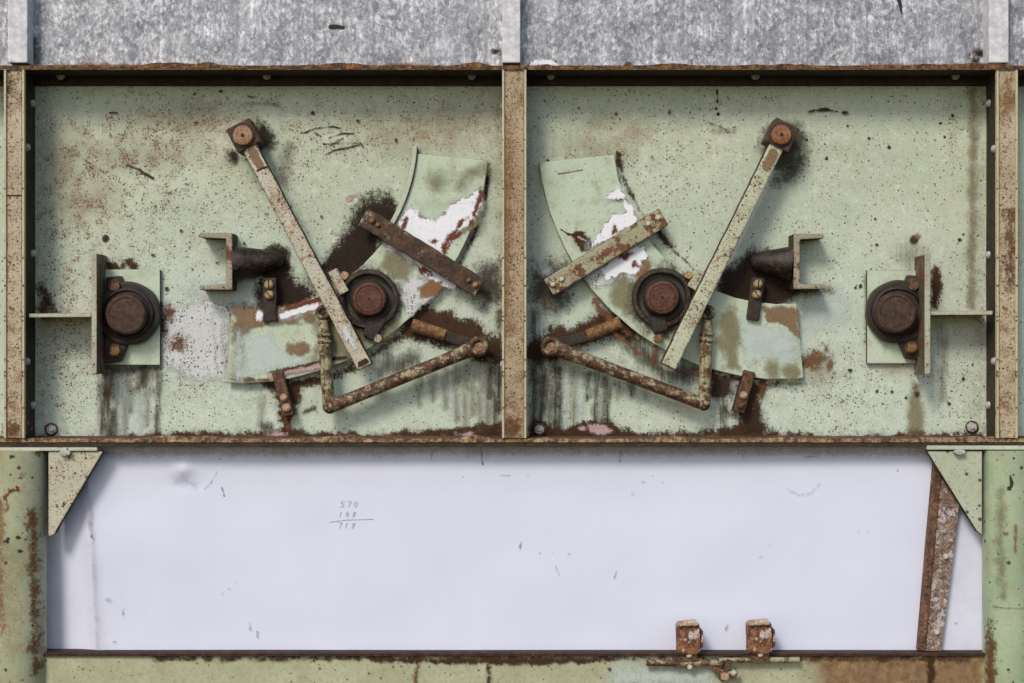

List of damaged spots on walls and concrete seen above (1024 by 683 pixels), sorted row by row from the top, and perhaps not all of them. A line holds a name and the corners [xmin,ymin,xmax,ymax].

rust [0,60,1024,126]
peeling [396,187,484,254]
rust [110,118,814,443]
peeling [561,187,637,251]
peeling [585,245,650,289]
rust [999,207,1021,294]
damp [481,350,502,436]
damp [529,354,611,432]
rust [802,345,835,372]
rust [0,486,20,636]
rust [23,503,45,676]
rust [148,656,673,683]